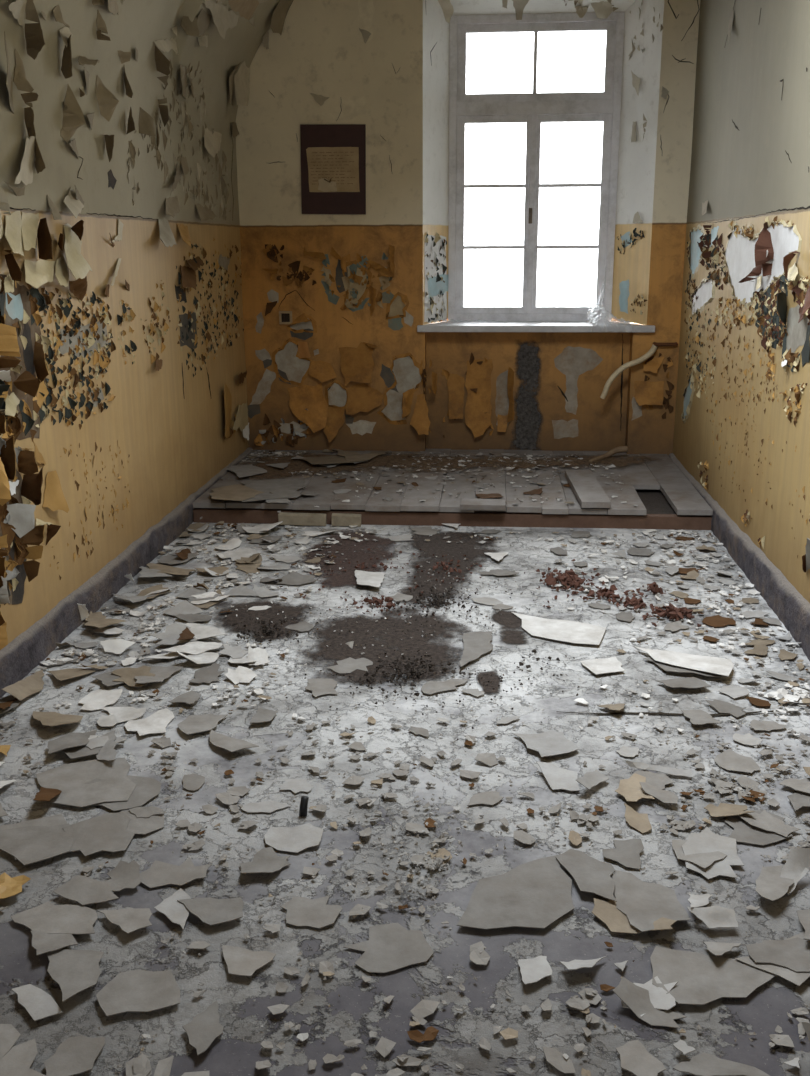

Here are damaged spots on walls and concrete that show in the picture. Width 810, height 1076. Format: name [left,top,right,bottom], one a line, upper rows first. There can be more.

peeling [502,0,529,20]
peeling [564,0,660,96]
peeling [631,113,647,142]
peeling [617,212,645,254]
peeling [0,0,448,650]
peeling [619,280,648,315]
peeling [224,313,515,463]
peeling [552,346,603,439]
peeling [631,216,810,526]
peeling [266,452,638,512]
peeling [794,537,810,572]